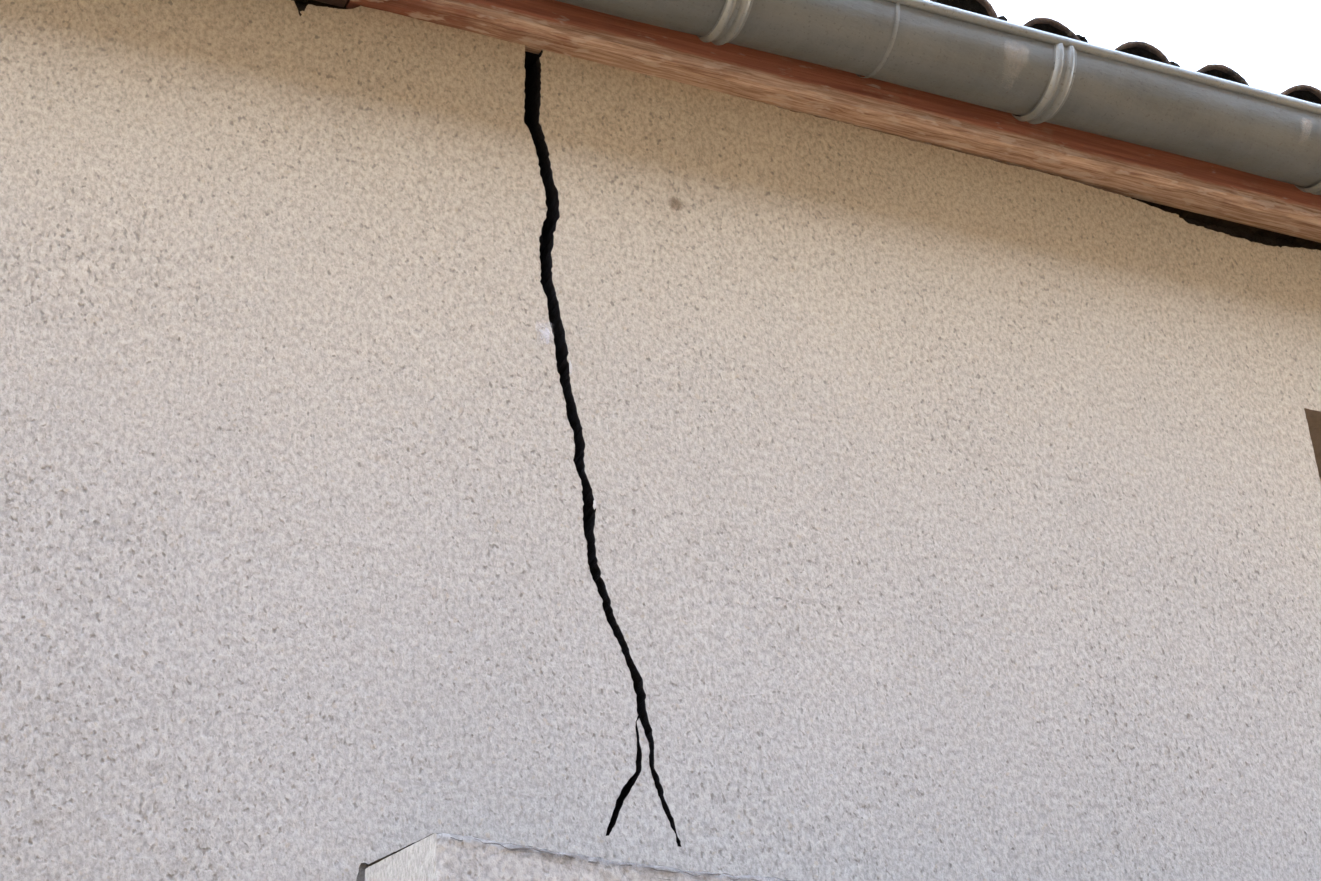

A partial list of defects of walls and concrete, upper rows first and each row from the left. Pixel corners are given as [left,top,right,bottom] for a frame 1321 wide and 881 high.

crack [450,50,781,881]